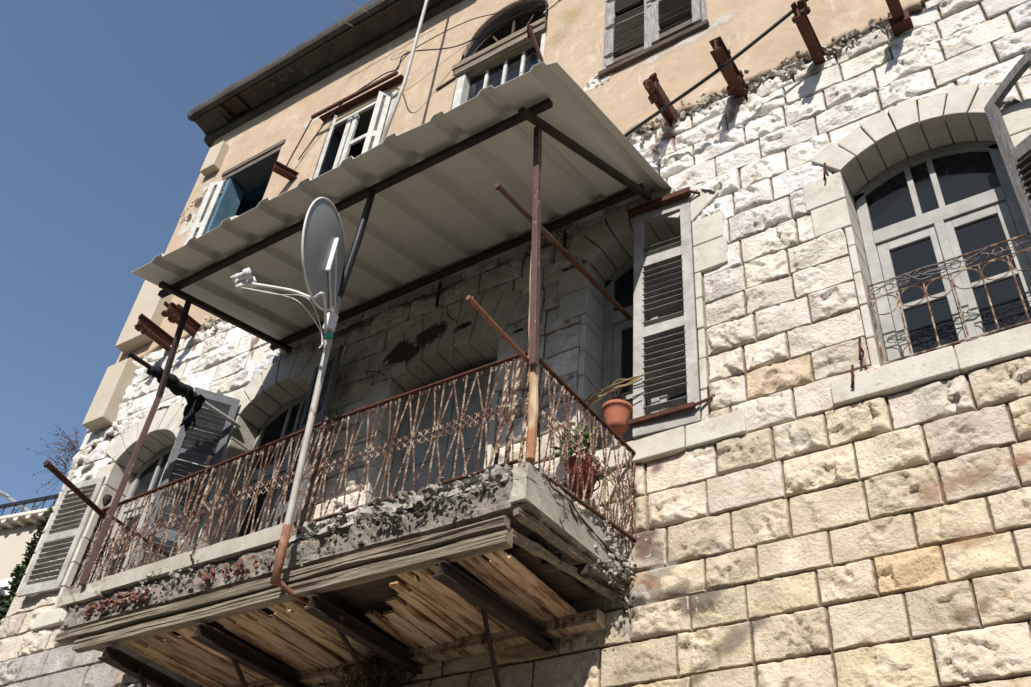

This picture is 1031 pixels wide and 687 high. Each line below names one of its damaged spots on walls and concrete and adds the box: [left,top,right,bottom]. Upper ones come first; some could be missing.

peeling [674,14,733,49]
spalling [821,12,893,60]
spalling [743,50,811,92]
spalling [626,87,729,147]
corrosion [728,95,744,120]
flaking render [177,180,222,237]
spalling [59,457,675,630]